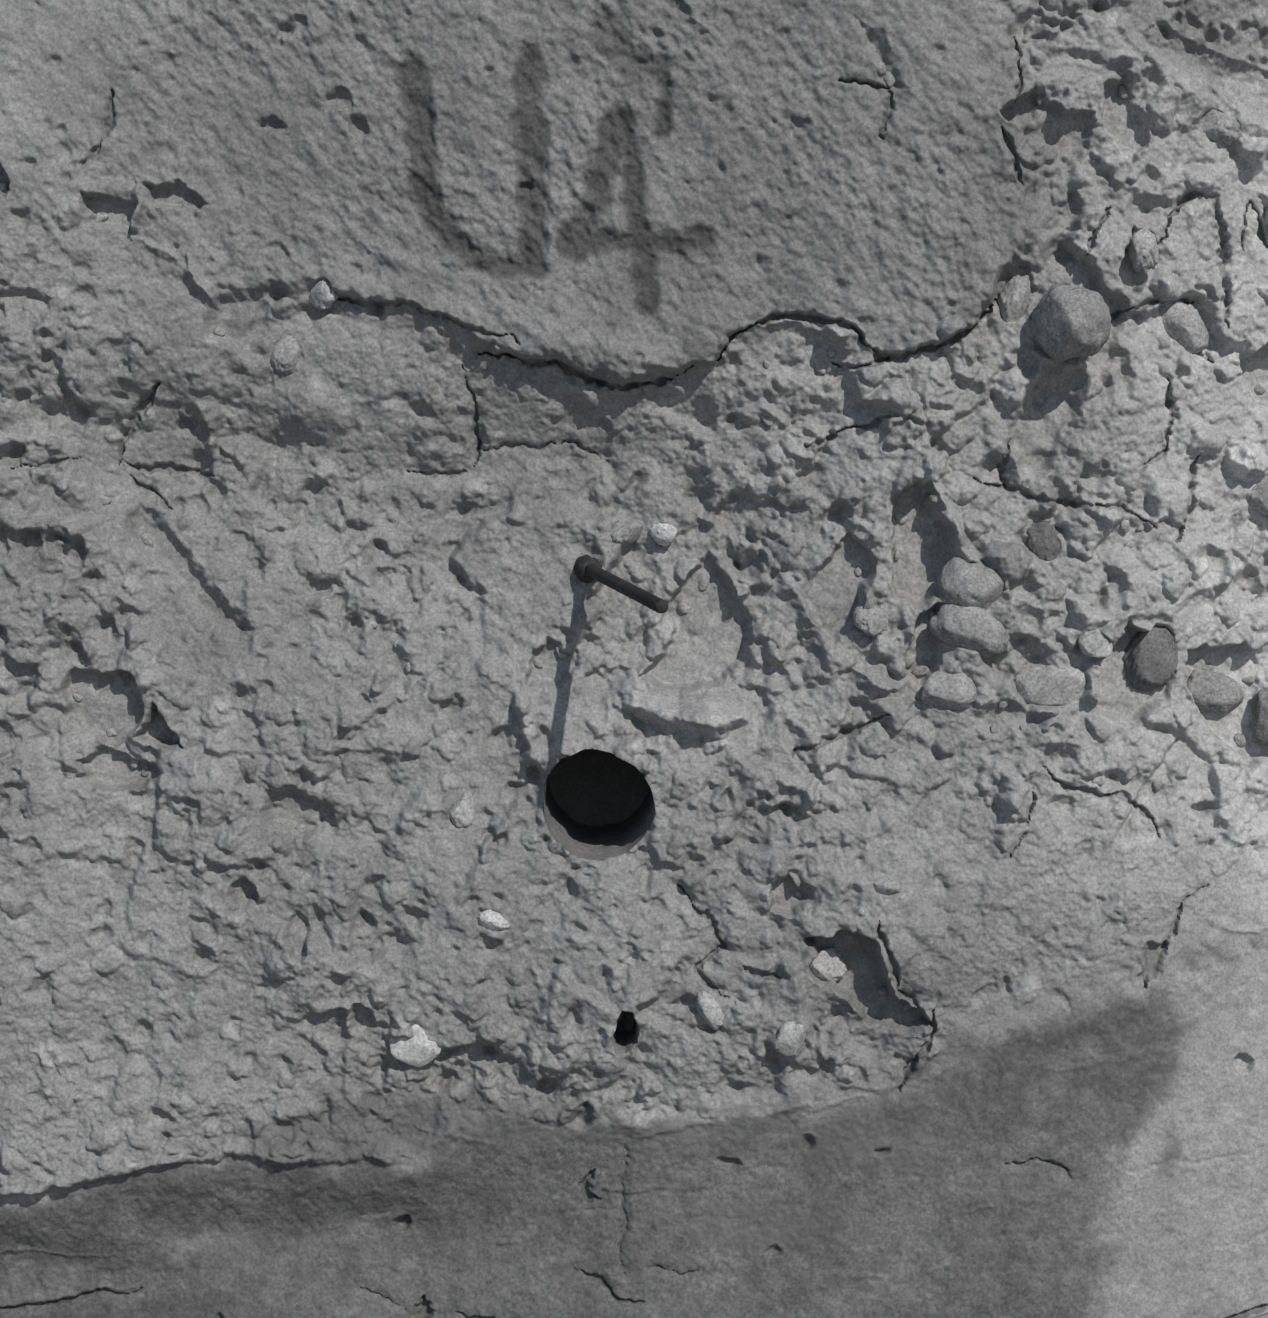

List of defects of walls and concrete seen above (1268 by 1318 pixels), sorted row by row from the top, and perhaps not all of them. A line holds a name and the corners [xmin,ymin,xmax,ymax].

crack [337,298,997,478]
spalling [202,12,1268,851]
spalling [16,473,260,644]
spalling [60,668,184,793]
spalling [226,878,260,908]
spalling [804,930,932,1038]
crack [1139,884,1210,989]
spalling [389,1024,442,1068]
crack [583,1183,601,1204]
crack [365,1288,432,1318]
crack [584,1271,643,1304]
crack [1226,1304,1268,1318]